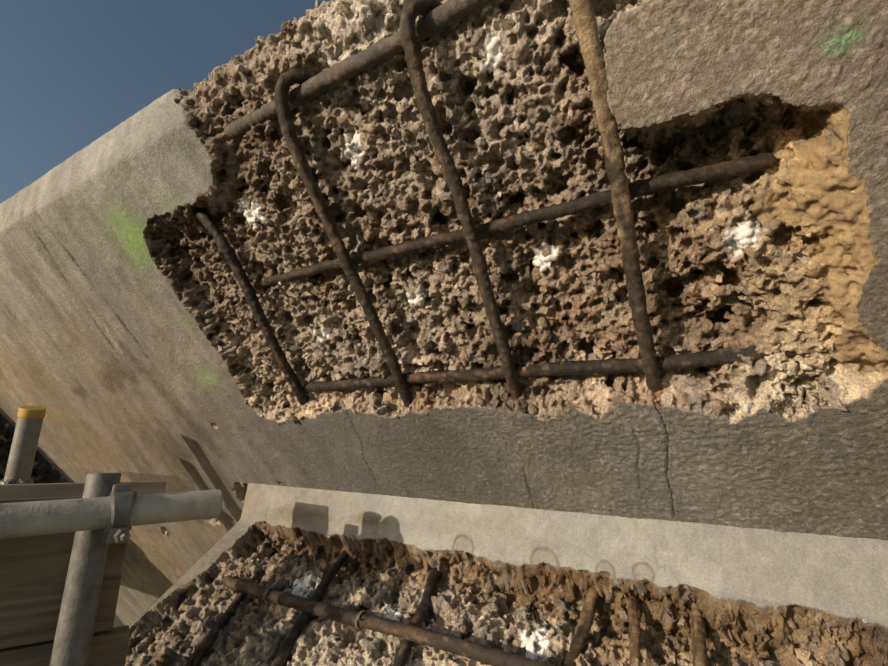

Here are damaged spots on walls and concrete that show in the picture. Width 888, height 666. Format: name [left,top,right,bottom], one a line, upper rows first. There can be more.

spalling [143,0,888,425]
corrosion [749,114,887,371]
crack [652,398,675,518]
spalling [125,520,888,666]